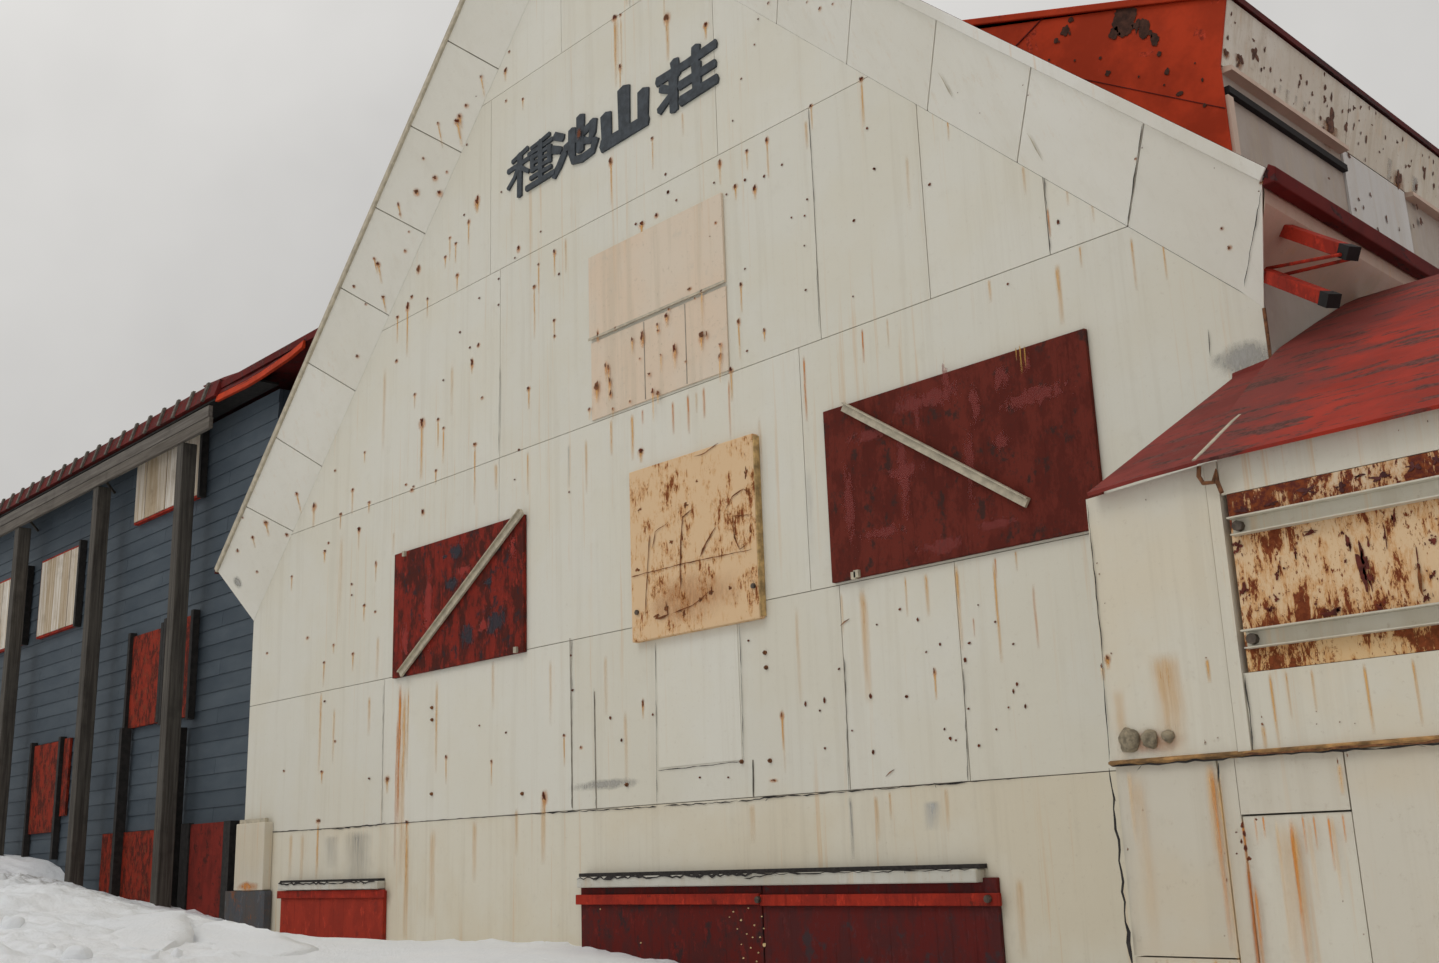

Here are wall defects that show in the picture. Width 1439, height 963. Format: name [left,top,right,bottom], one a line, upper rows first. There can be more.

peeling [1048,17,1074,61]
peeling [1108,7,1183,96]
corrosion [1293,72,1376,162]
corrosion [368,693,409,794]
corrosion [1290,817,1345,920]
corrosion [1247,871,1262,963]